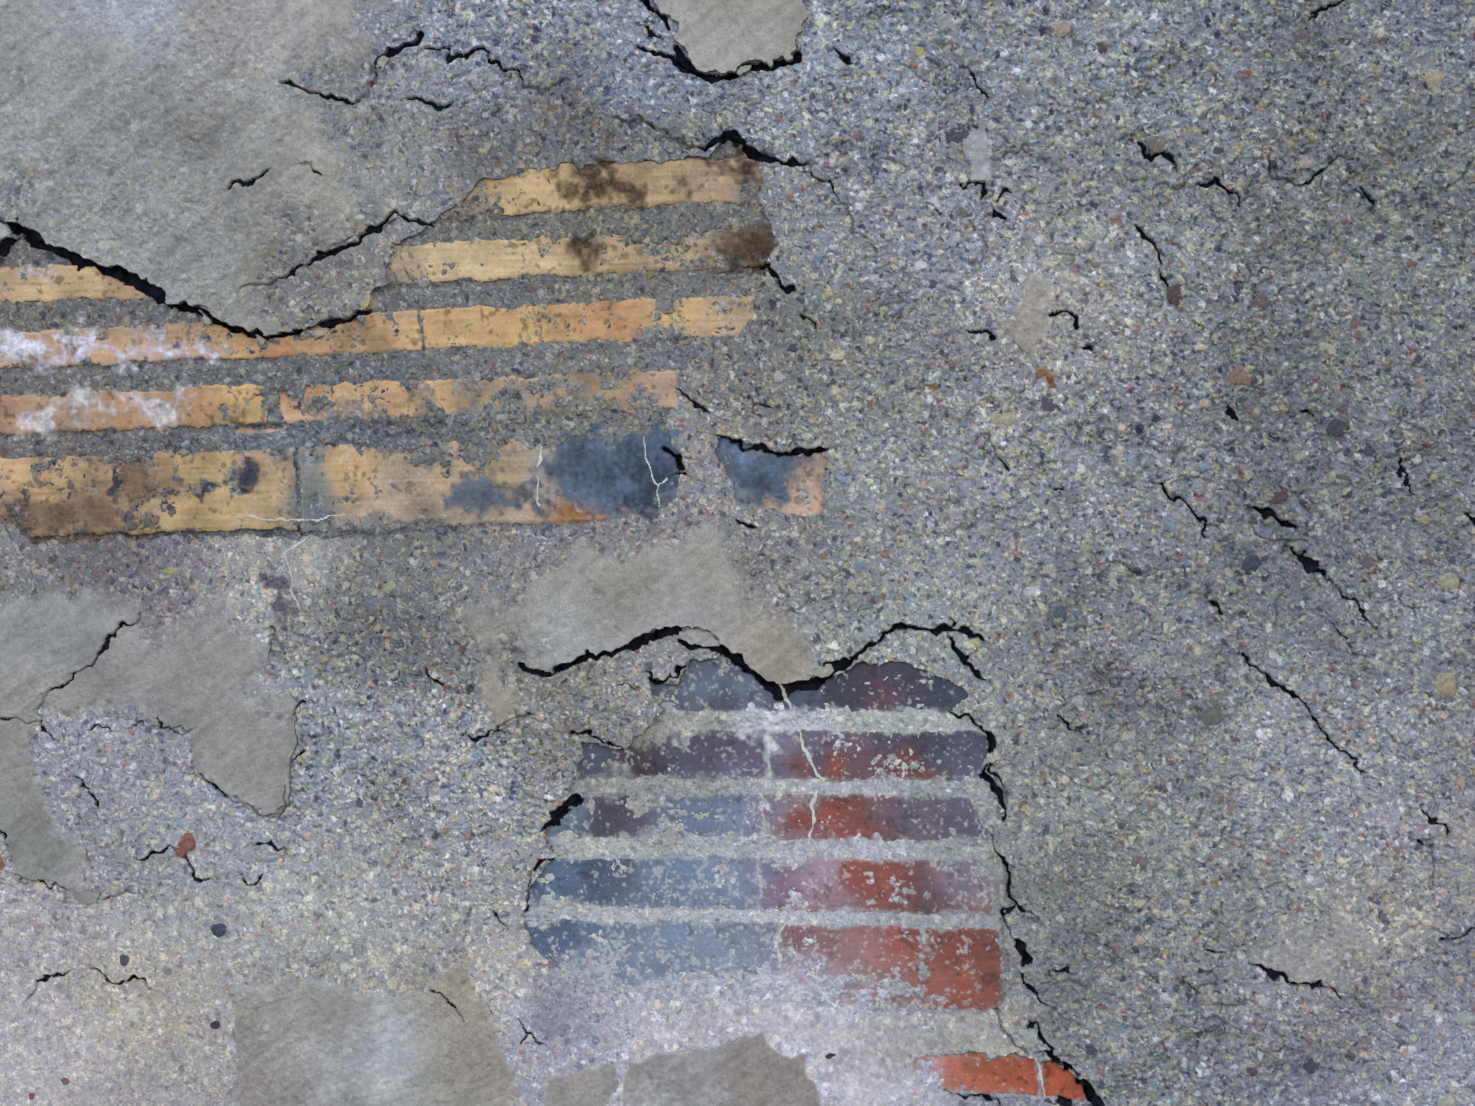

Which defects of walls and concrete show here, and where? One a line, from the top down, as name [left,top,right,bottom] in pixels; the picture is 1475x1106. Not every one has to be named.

crack [424,47,524,81]
crack [637,25,696,76]
peeling [639,0,807,84]
crack [697,129,837,195]
crack [279,211,434,279]
spalling [0,140,774,545]
spalling [715,436,829,517]
crack [0,622,134,740]
spalling [508,610,1010,1021]
crack [140,841,281,886]
crack [37,968,147,985]
spalling [913,1050,1092,1106]